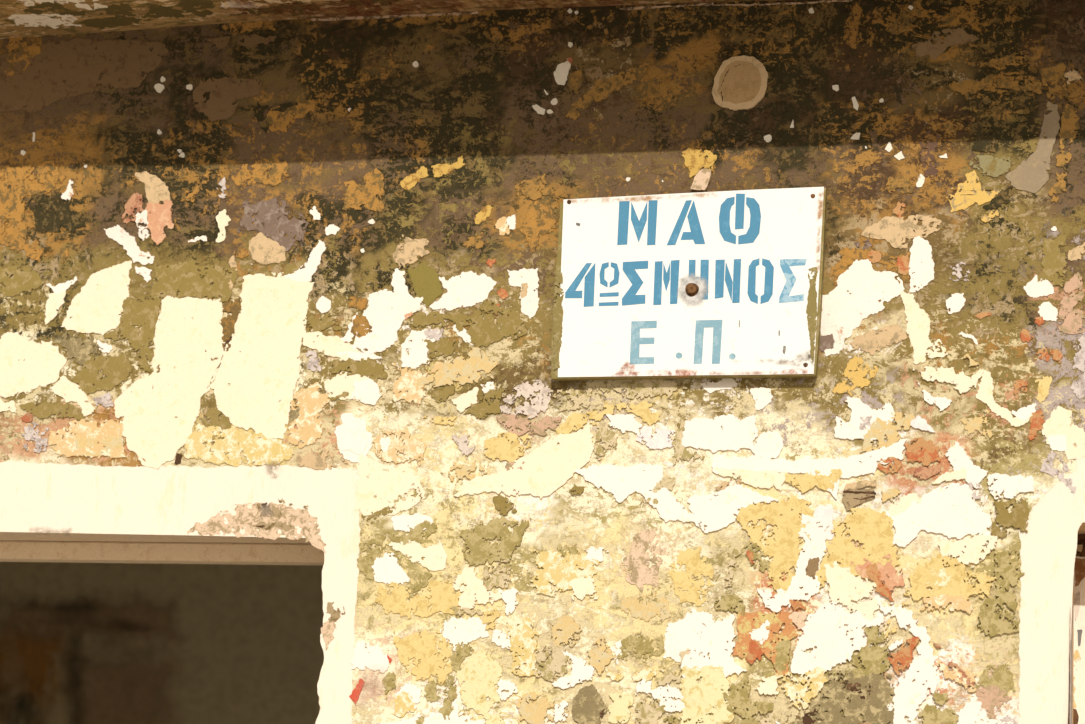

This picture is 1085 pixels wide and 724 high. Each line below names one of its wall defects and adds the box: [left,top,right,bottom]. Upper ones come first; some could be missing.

peeling [0,0,398,112]
peeling [186,77,330,134]
peeling [532,42,651,120]
peeling [912,27,979,60]
peeling [682,148,717,178]
peeling [834,132,867,173]
peeling [885,120,957,194]
peeling [934,49,1085,399]
peeling [0,155,1085,724]